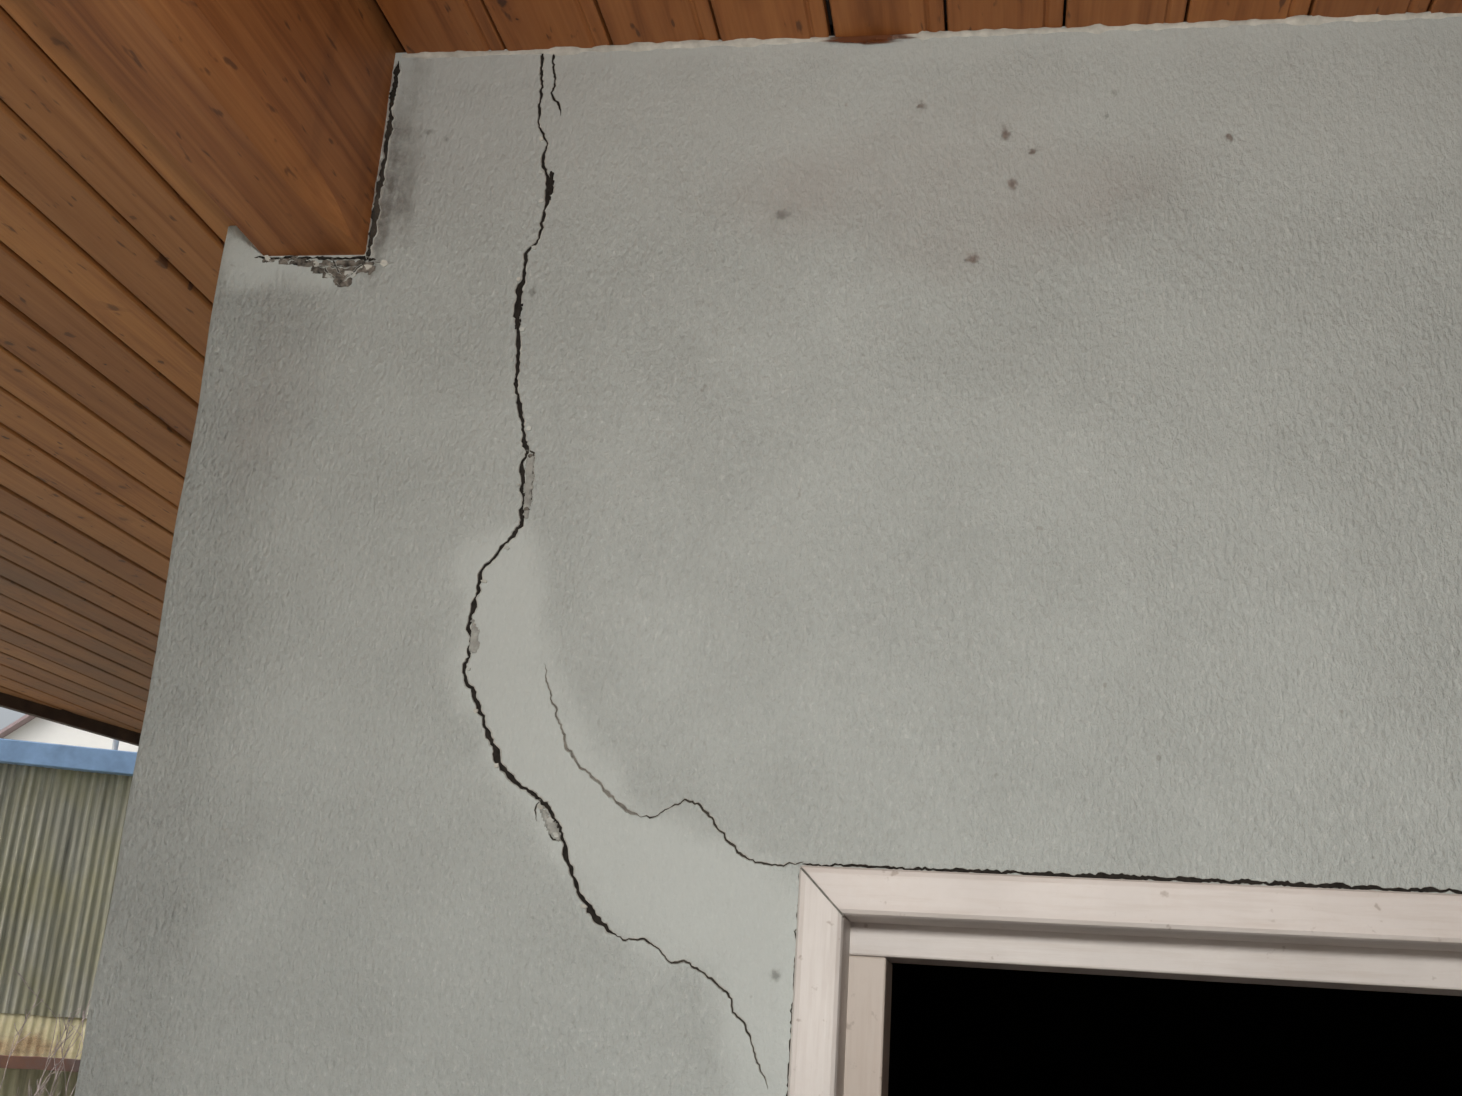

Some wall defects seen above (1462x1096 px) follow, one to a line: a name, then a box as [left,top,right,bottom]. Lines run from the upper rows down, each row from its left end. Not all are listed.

flaking render [262,255,389,287]
crack [461,53,1462,1096]